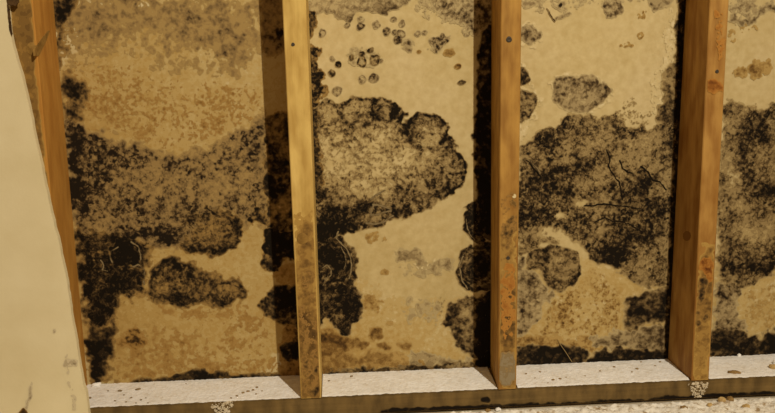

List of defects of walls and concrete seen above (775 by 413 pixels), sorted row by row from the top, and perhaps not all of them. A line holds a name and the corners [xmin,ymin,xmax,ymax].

mould [732,58,773,80]
leakage [53,0,686,398]
leakage [696,103,775,357]